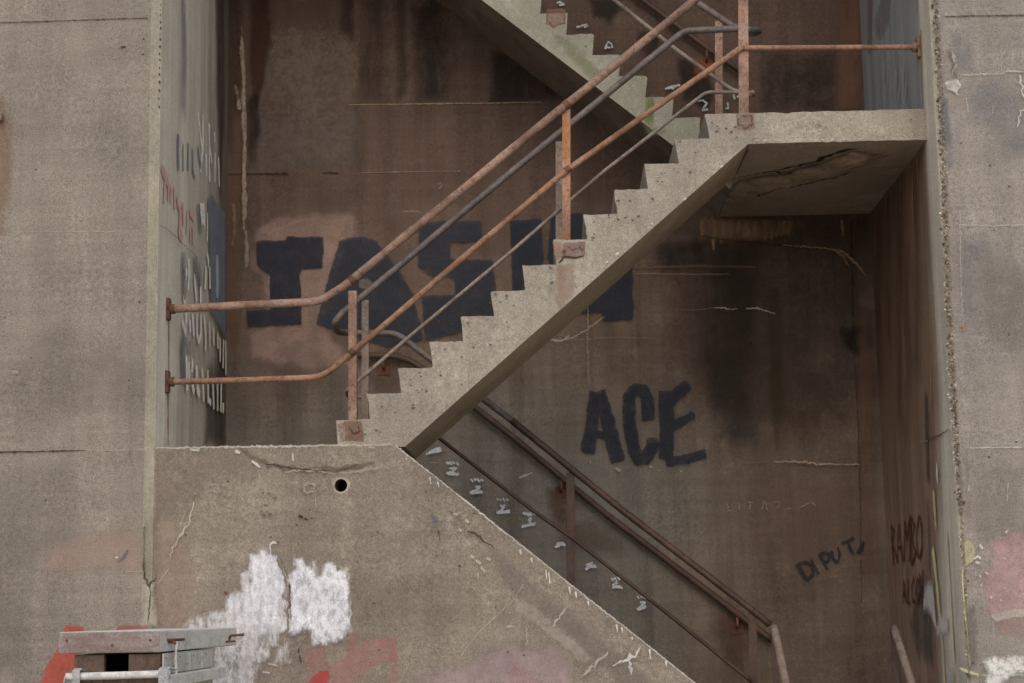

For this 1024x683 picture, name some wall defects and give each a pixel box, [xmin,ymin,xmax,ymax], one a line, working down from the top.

damp [217,0,249,266]
crack [701,236,866,276]
crack [239,447,377,474]
rust [343,421,364,442]
crack [127,502,194,621]
damp [155,367,695,683]